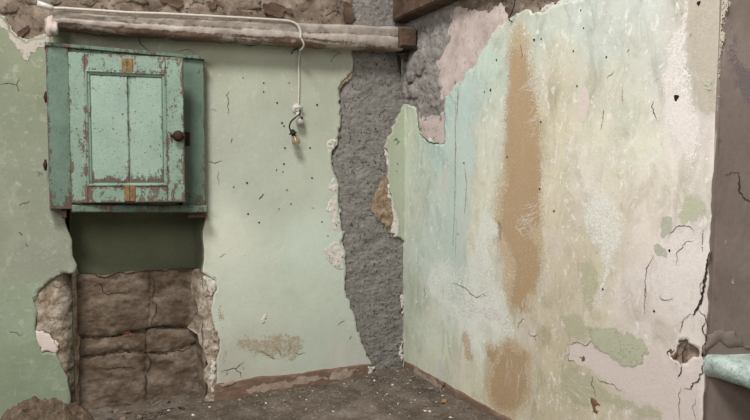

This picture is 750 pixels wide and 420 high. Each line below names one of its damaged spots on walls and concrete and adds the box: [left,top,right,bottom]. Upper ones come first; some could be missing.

spalling [0,0,356,60]
flaking render [436,0,574,100]
spalling [326,110,342,153]
flaking render [417,111,445,144]
spalling [324,178,345,270]
spalling [371,178,400,237]
spalling [33,268,242,410]
water stain [237,333,304,361]
peeling [246,368,359,394]
peeling [567,326,750,420]
crack [678,251,712,419]